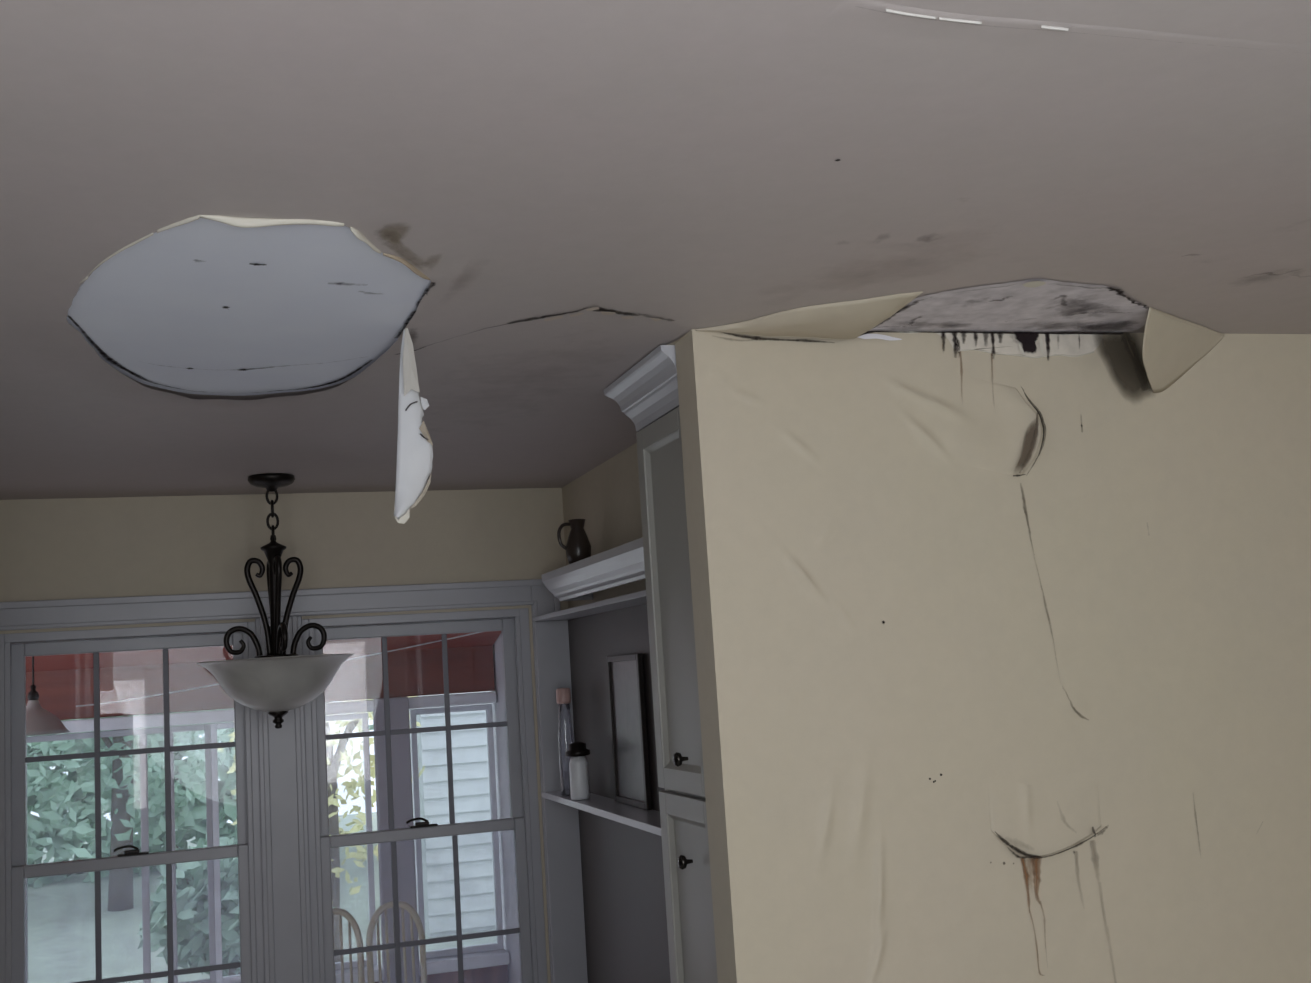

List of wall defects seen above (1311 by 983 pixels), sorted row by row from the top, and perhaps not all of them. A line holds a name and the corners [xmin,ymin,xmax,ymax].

crack [507,307,672,324]
peeling [695,291,923,342]
damp [860,301,1150,396]
peeling [936,333,1103,358]
peeling [1142,307,1224,393]